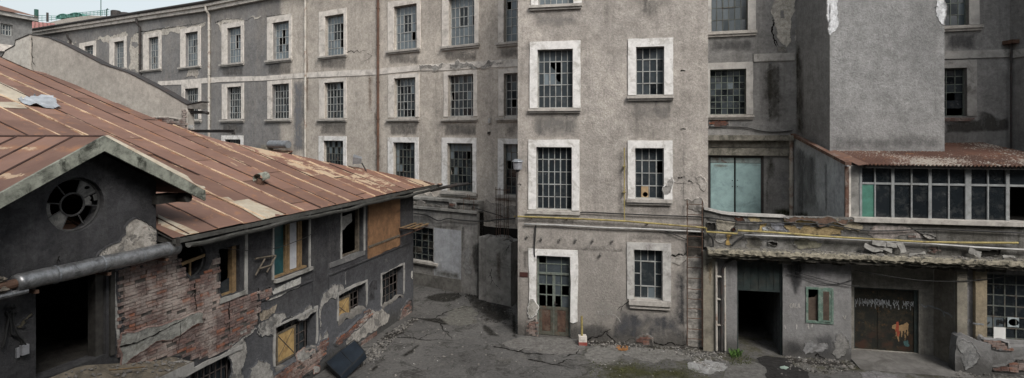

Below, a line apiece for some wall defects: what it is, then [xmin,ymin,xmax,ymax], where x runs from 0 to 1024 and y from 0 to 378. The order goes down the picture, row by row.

peeling [826,0,840,36]
peeling [935,0,947,26]
peeling [96,217,158,257]
peeling [671,175,941,349]
spalling [980,249,1001,258]
flaking render [115,253,413,378]
flaking render [525,298,539,337]